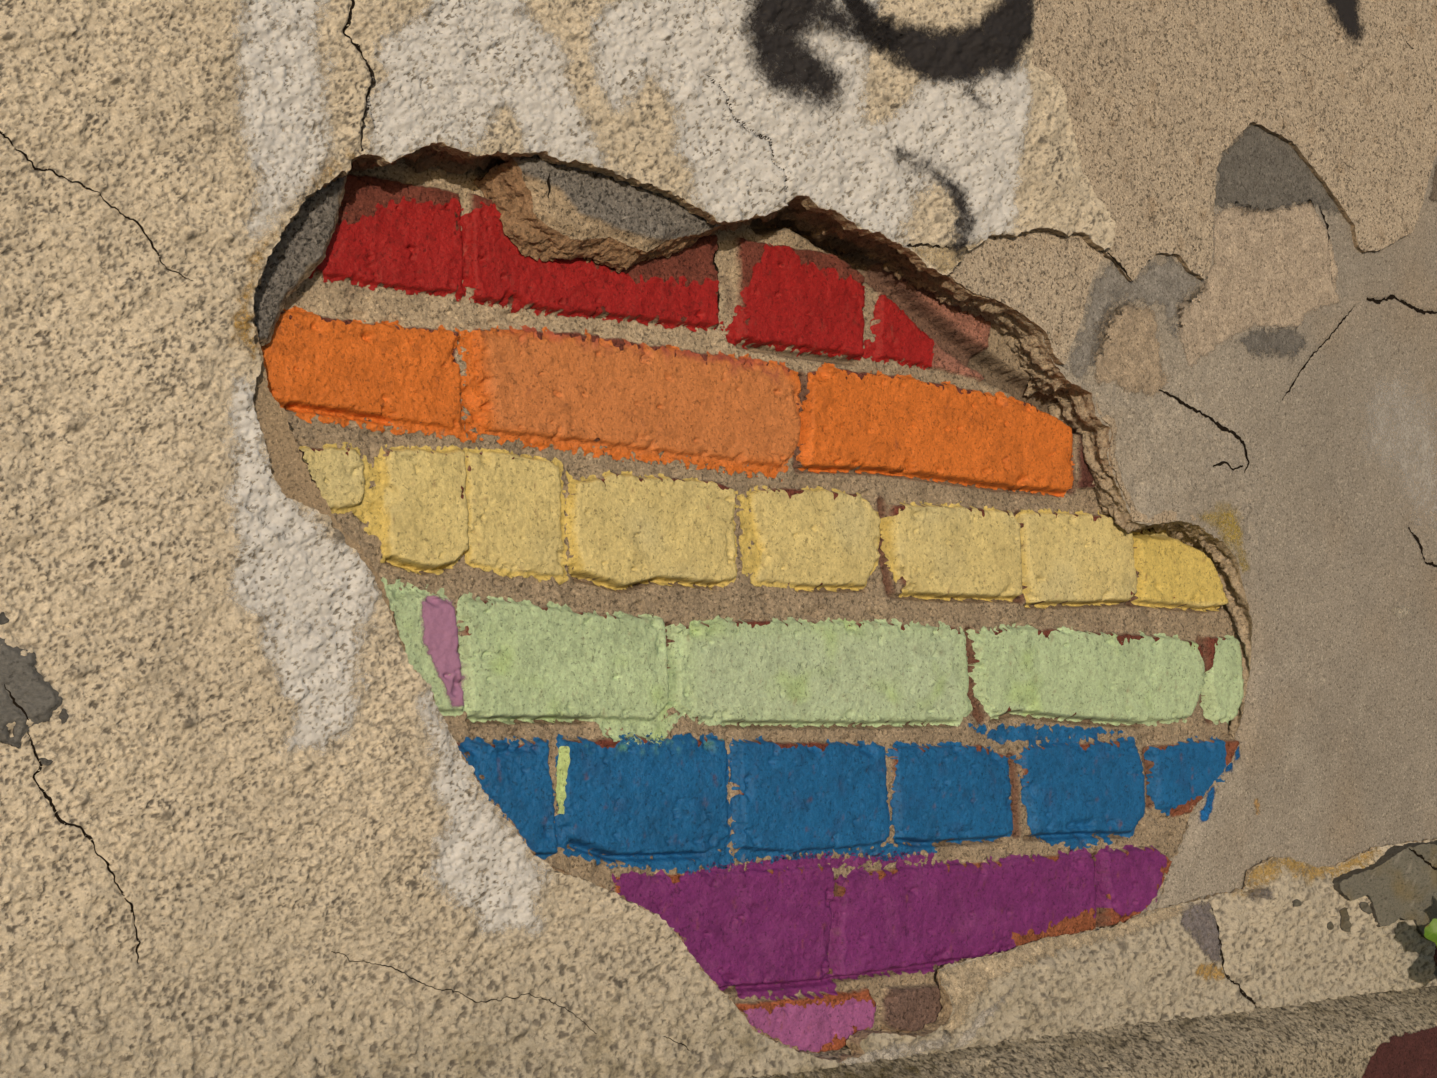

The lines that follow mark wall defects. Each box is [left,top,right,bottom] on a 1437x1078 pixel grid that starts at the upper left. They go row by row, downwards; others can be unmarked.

crack [343,0,376,151]
crack [0,131,193,281]
crack [1282,204,1437,401]
flaking render [251,0,1437,918]
crack [1159,389,1250,473]
crack [4,684,141,963]